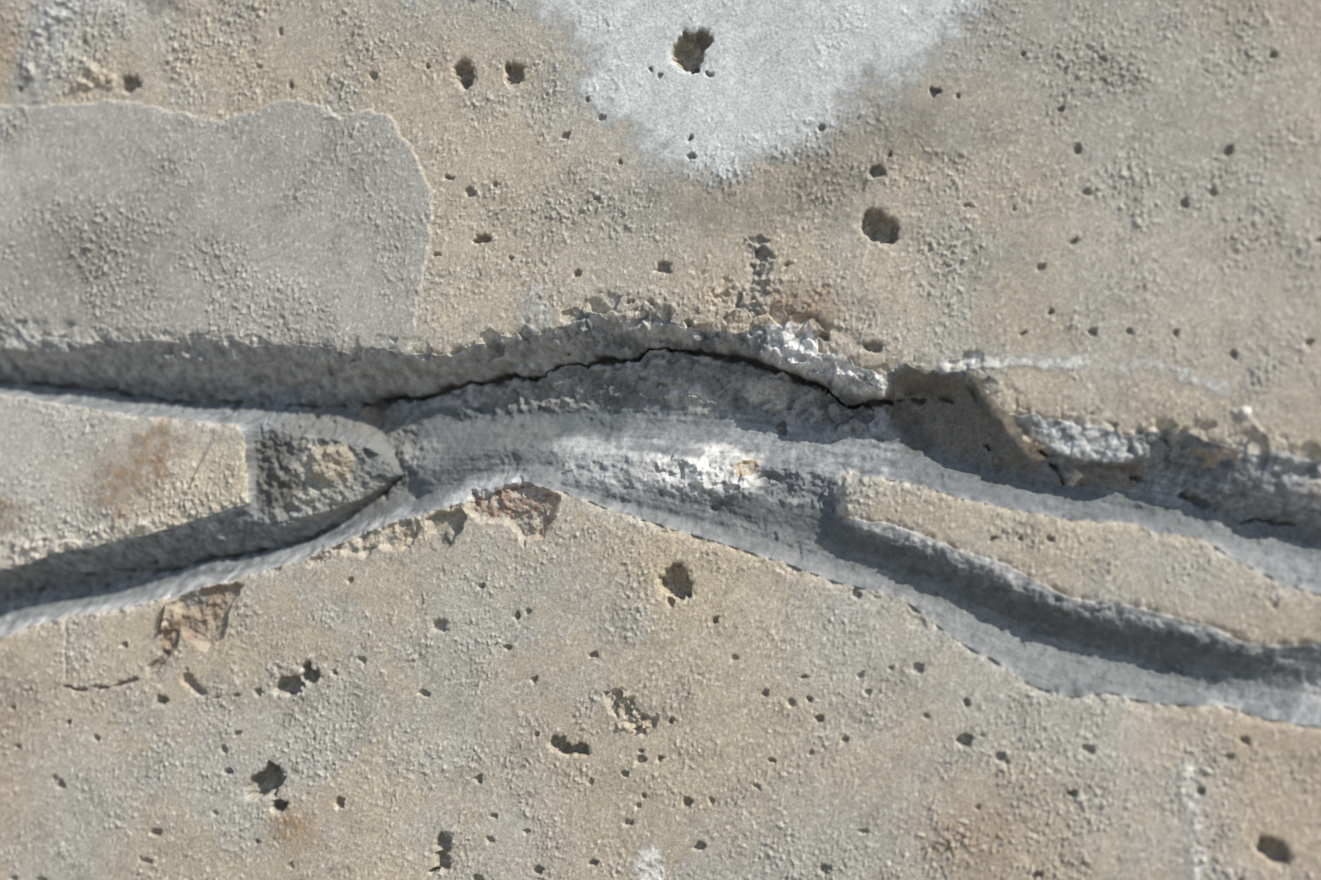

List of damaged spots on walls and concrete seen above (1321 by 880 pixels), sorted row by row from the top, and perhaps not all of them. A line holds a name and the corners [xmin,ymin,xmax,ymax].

damp [538,0,991,184]
spalling [704,235,1045,471]
peeling [0,510,172,570]
spalling [243,420,405,524]
spalling [304,481,563,570]
crack [0,307,1321,728]
spalling [52,581,247,694]
spalling [600,685,663,740]